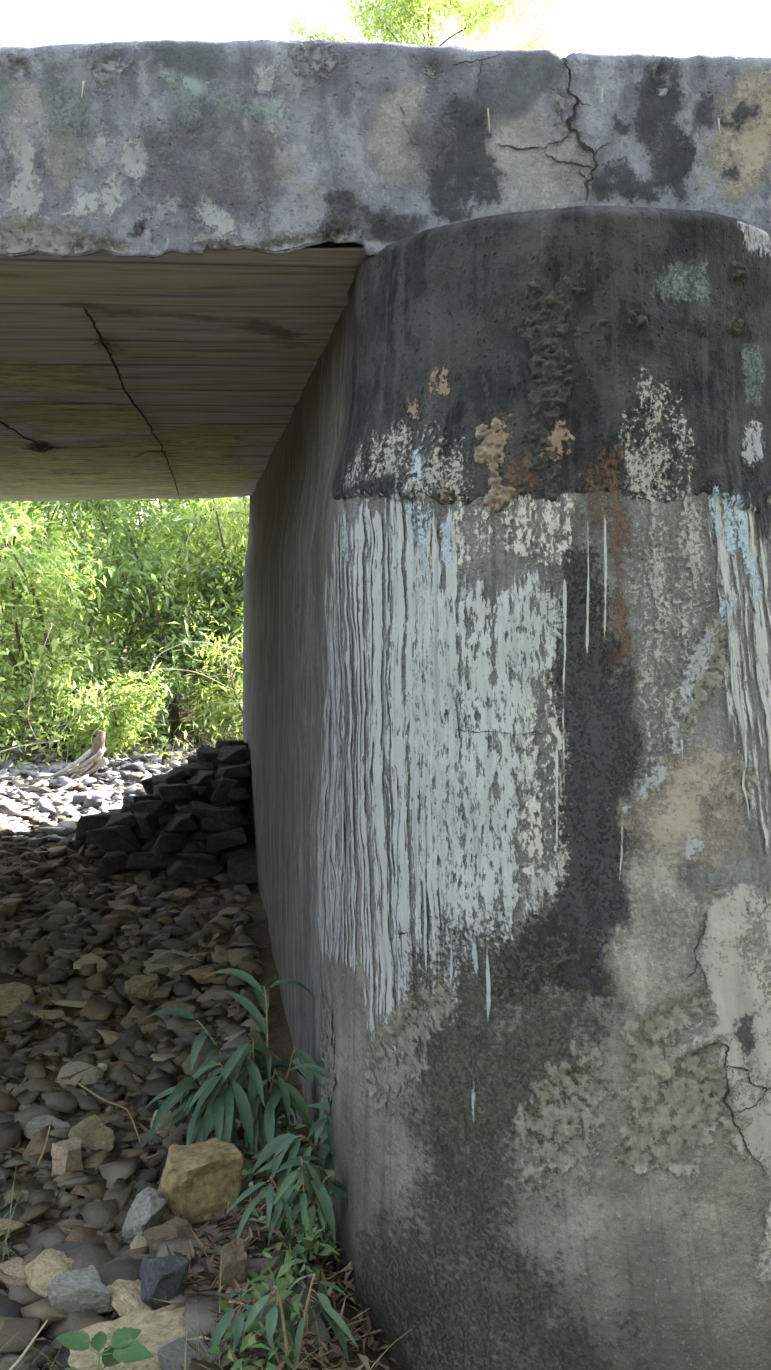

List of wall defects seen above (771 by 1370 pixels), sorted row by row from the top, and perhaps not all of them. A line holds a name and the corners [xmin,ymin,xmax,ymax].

damp [317,49,569,241]
crack [497,48,611,200]
damp [589,56,761,205]
crack [0,421,42,450]
crack [84,307,181,502]
damp [330,419,474,738]
rust [580,445,633,670]
damp [294,630,352,899]
damp [354,367,771,1370]
crack [685,909,709,987]
crack [690,1041,771,1171]